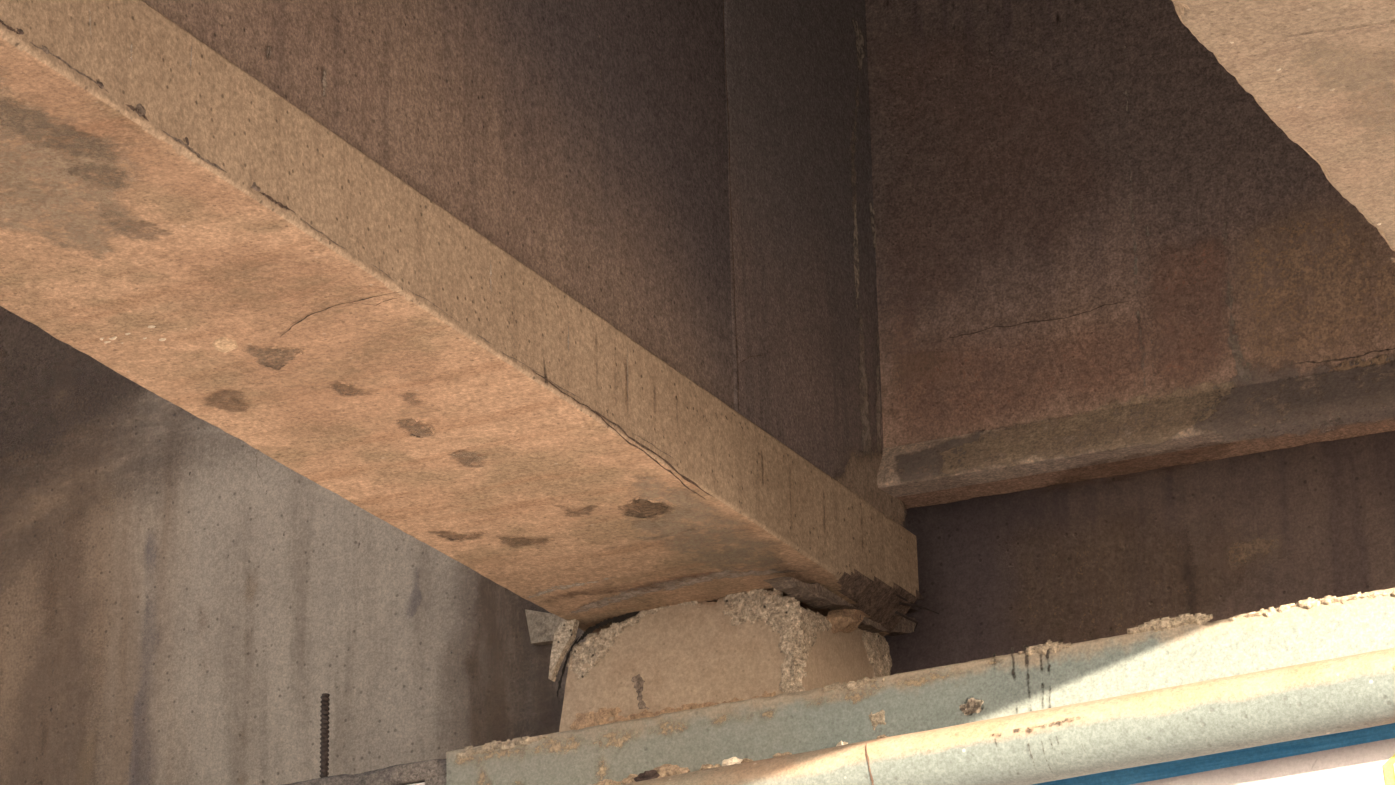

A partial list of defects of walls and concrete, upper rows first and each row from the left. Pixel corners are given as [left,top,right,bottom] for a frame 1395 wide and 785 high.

leakage [0,98,133,253]
crack [280,291,403,337]
leakage [836,87,1395,525]
spalling [548,576,939,730]